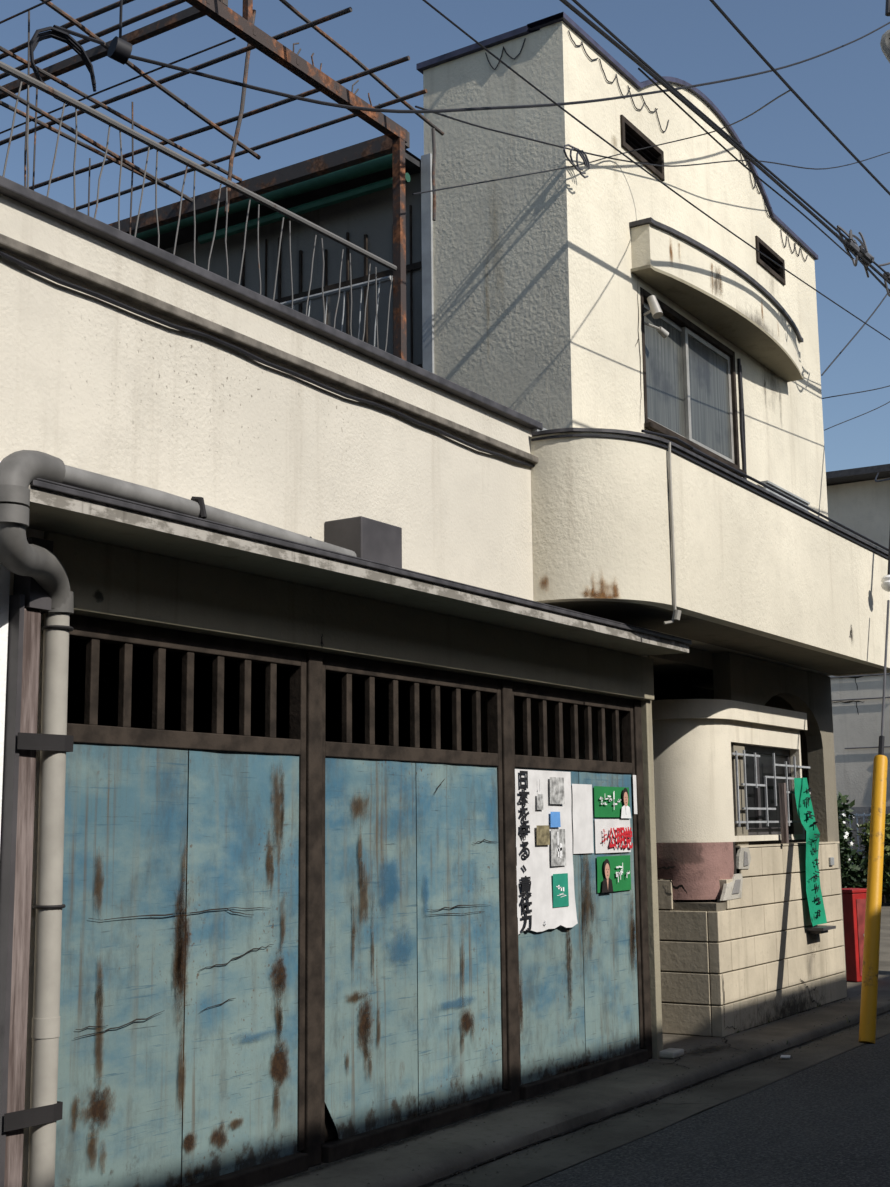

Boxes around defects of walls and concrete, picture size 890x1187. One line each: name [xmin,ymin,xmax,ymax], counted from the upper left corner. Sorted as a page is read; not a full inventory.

corrosion [266,773,285,888]
crack [88,907,262,921]
corrosion [174,854,190,997]
crack [200,944,274,970]
corrosion [73,969,112,1167]
crack [73,1010,165,1039]
corrosion [178,1050,186,1106]
corrosion [271,958,289,1125]
corrosion [348,992,380,1076]
corrosion [462,1010,474,1047]
corrosion [184,1133,196,1152]
corrosion [211,1119,243,1148]